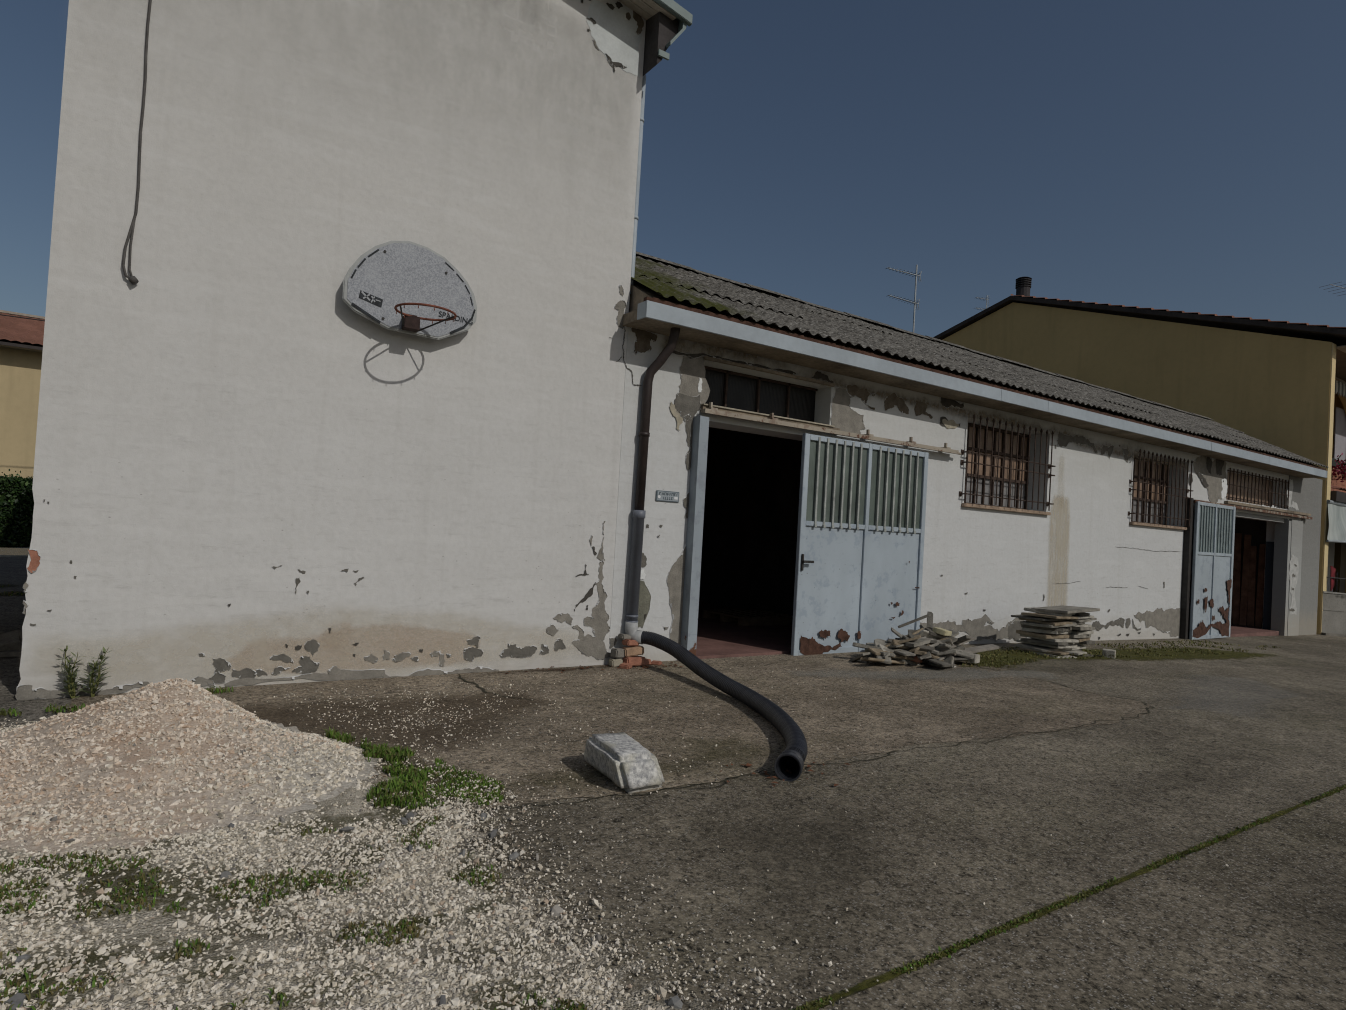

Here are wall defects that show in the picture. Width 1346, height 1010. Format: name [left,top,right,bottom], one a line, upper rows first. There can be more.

peeling [581,0,644,77]
peeling [614,285,657,355]
peeling [670,350,964,470]
spalling [22,549,41,626]
spalling [15,681,161,700]
spalling [187,521,768,823]
corrosion [800,629,861,655]
spalling [920,609,1027,642]
spalling [1091,607,1181,640]
corrosion [1193,579,1232,638]